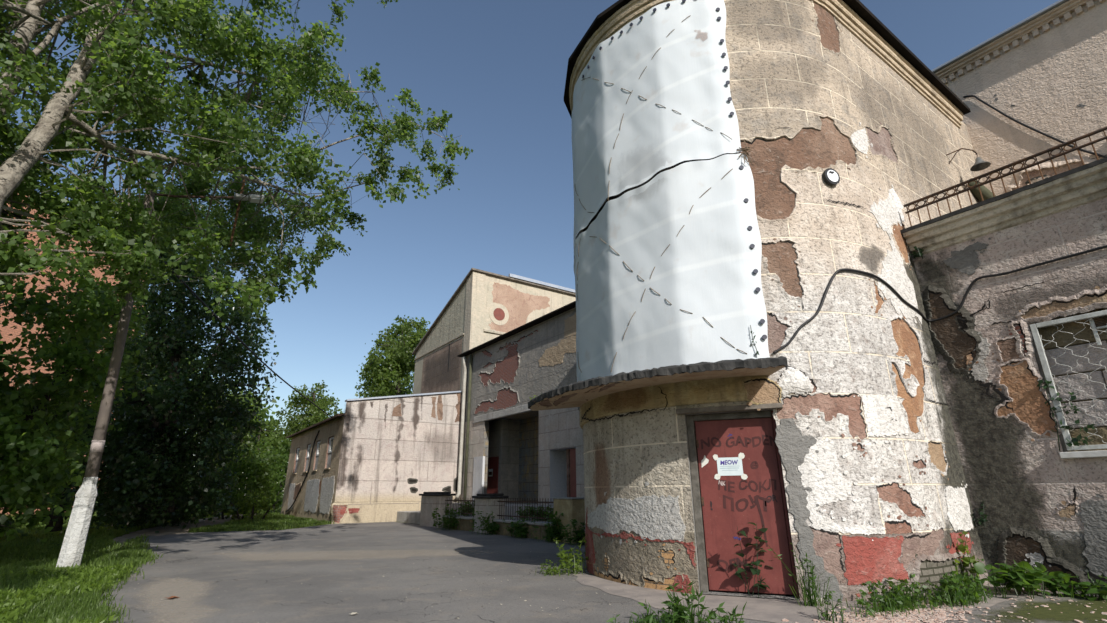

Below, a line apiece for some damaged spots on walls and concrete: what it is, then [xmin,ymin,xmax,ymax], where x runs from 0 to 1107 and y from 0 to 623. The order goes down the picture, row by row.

spalling [810,1,842,56]
spalling [730,114,898,224]
water stain [336,402,387,489]
water stain [395,396,423,462]
spalling [430,392,461,423]
spalling [474,282,550,416]
spalling [742,185,1107,597]
water stain [905,255,1107,589]
peeling [585,481,696,594]